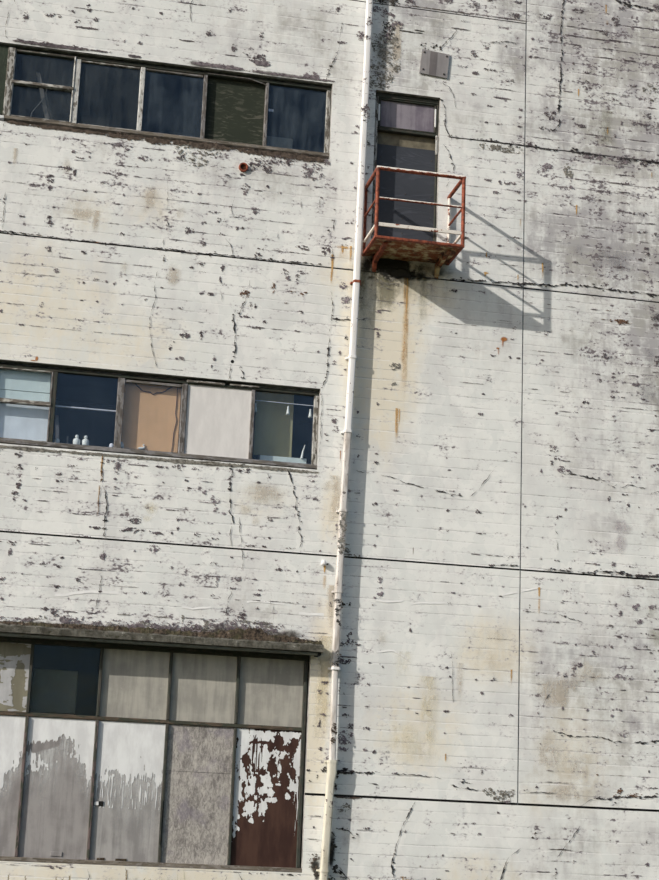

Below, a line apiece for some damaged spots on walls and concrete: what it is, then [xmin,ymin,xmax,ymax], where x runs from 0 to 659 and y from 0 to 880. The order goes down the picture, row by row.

crack [440,0,659,185]
peeling [7,120,330,204]
crack [0,181,335,319]
damp [361,257,443,303]
crack [221,283,250,380]
crack [228,465,243,557]
crack [287,469,305,546]
peeling [329,599,361,667]
peeling [317,681,370,751]
crack [391,806,413,880]